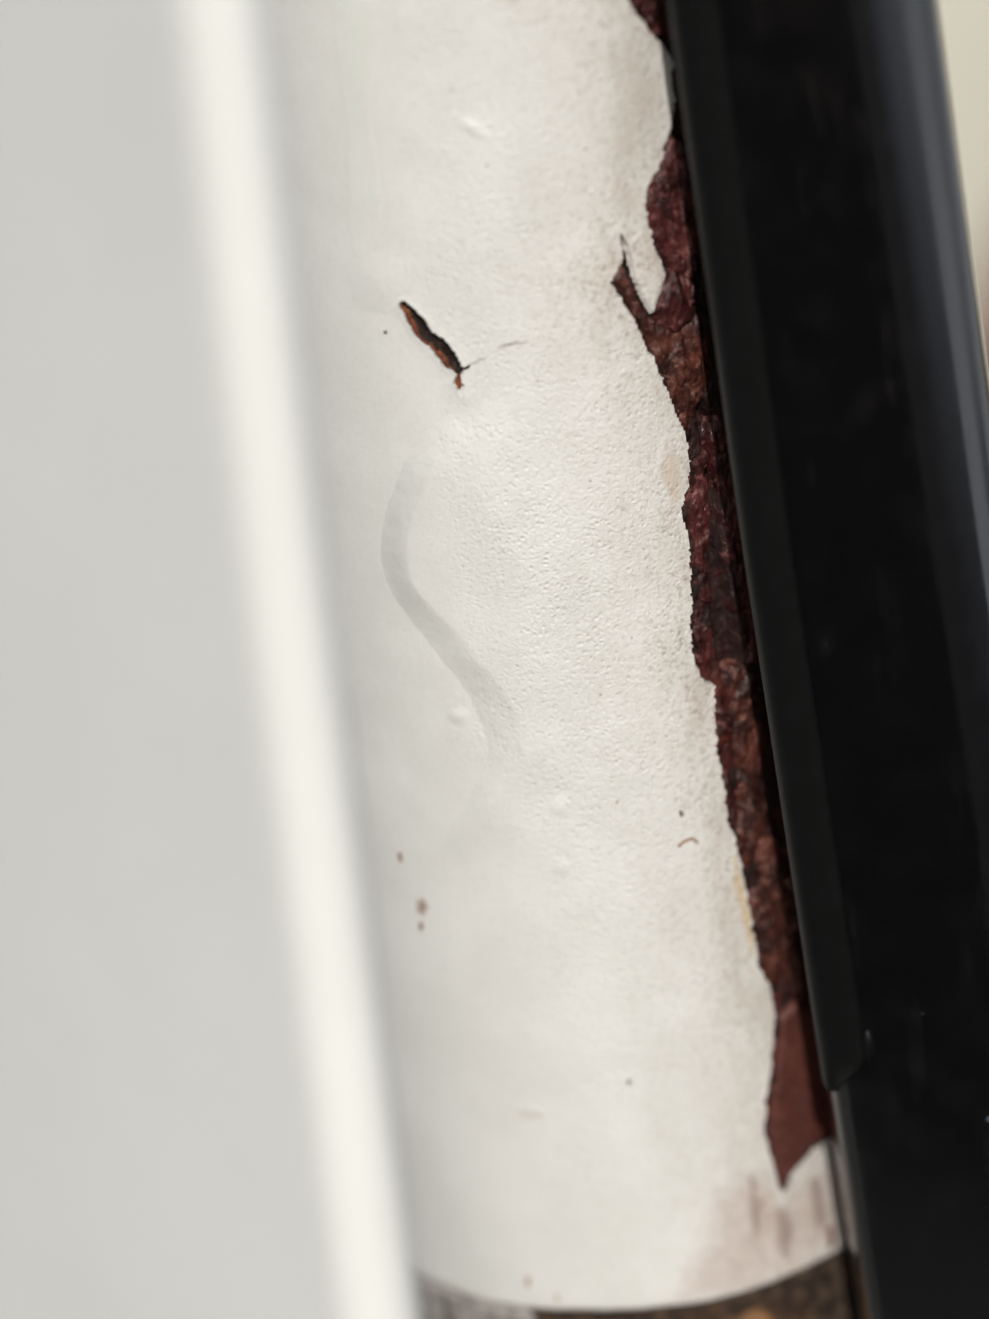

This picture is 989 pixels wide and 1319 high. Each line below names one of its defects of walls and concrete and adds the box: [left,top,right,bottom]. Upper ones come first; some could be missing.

corrosion [653,437,688,514]
peeling [610,0,831,1192]
corrosion [725,848,757,968]
corrosion [529,1225,858,1319]